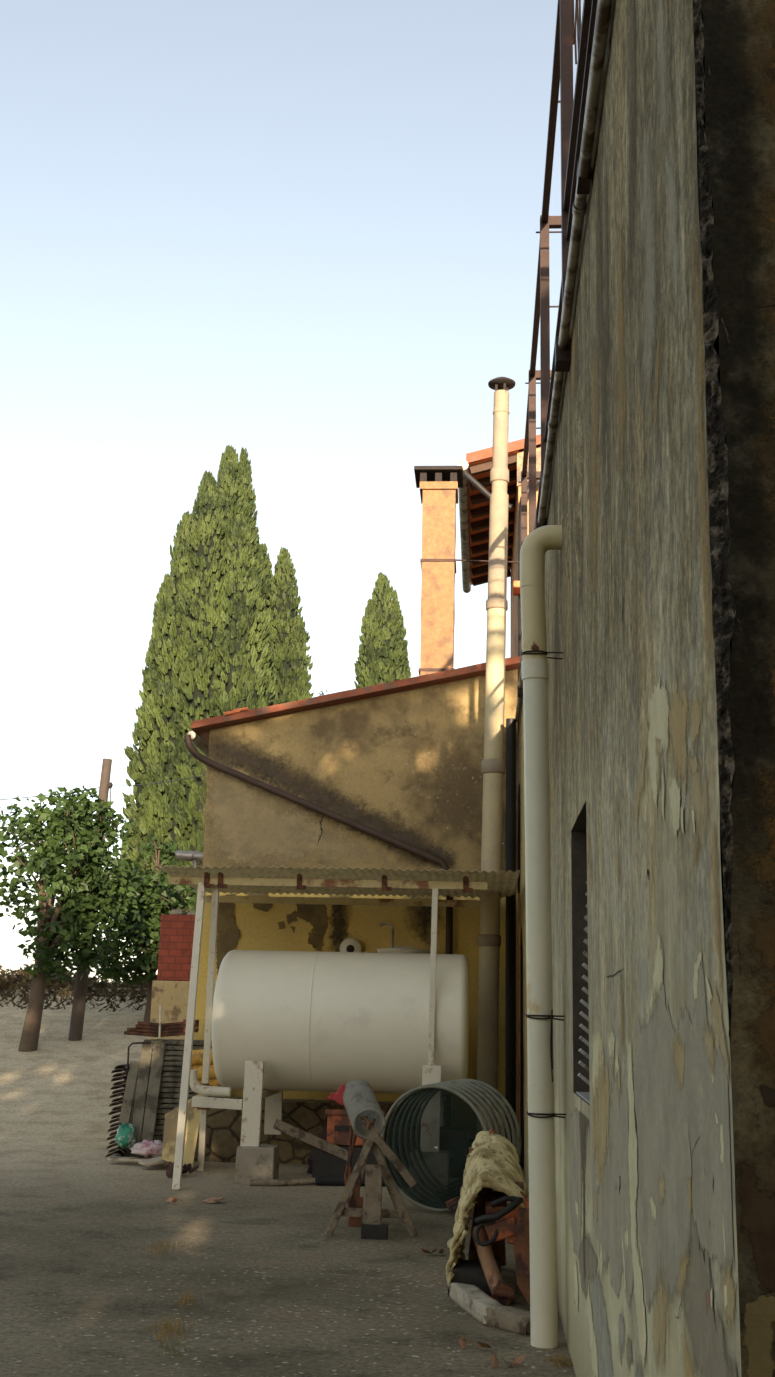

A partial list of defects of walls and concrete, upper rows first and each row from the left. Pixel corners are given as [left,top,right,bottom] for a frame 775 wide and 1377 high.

leakage [628,0,649,281]
peeling [216,893,328,973]
leakage [206,766,389,866]
peeling [569,0,746,1377]